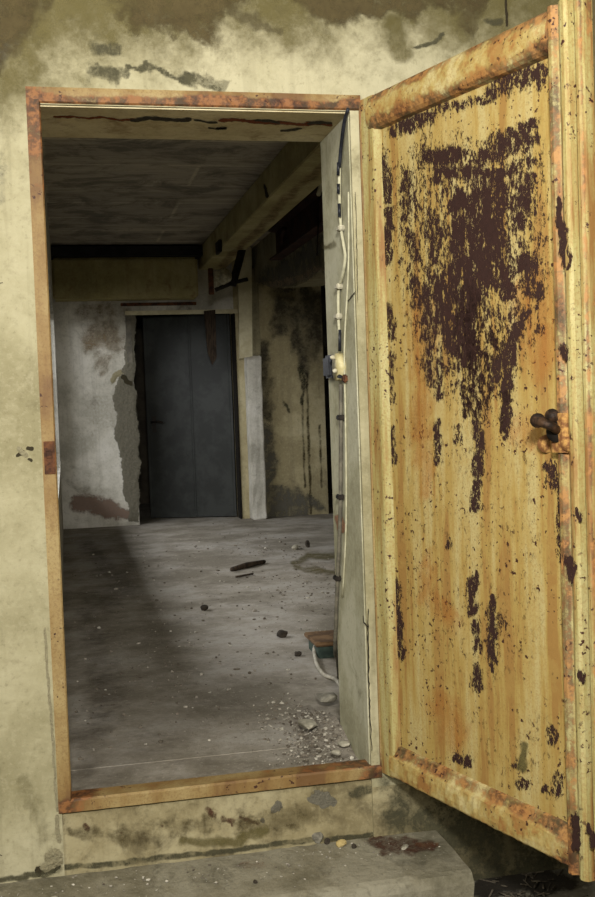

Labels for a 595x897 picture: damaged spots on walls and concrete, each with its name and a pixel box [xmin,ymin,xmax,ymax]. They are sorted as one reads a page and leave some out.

leakage [0,0,559,103]
flaking render [110,315,141,522]
leakage [259,287,327,517]
leakage [64,817,311,870]
leakage [330,832,373,841]
rust [369,836,436,856]